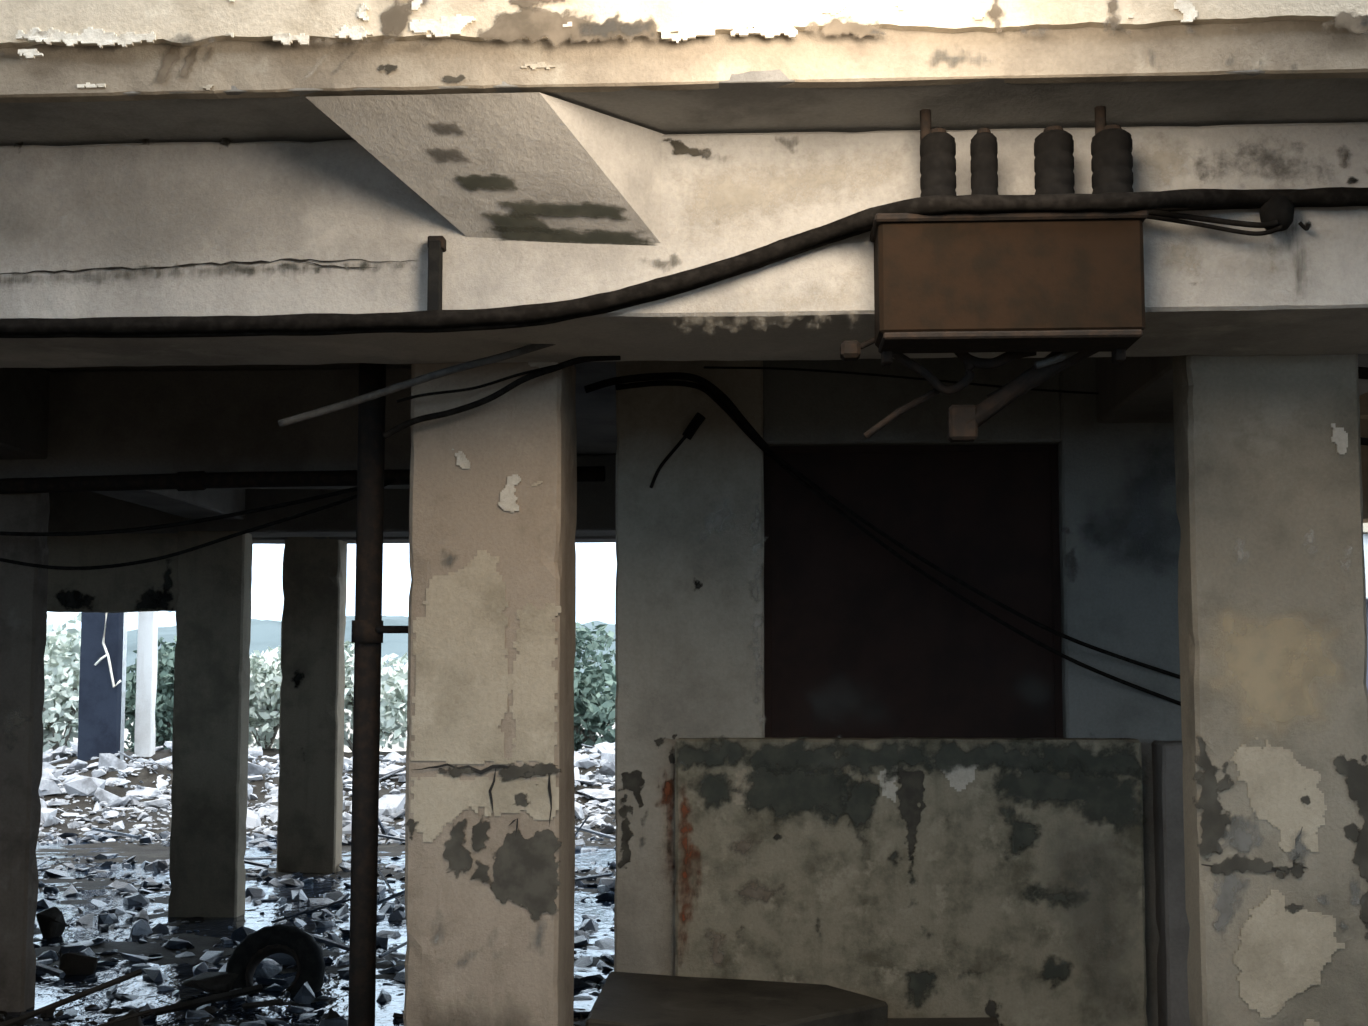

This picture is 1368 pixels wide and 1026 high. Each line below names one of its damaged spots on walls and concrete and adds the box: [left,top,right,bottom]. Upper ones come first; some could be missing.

peeling [16,27,156,59]
peeling [410,0,476,38]
spalling [427,123,653,246]
peeling [406,550,562,920]
crack [414,763,561,836]
damp [617,770,645,868]
corrosion [661,780,700,941]
damp [654,734,1144,883]
damp [1025,884,1085,907]
peeling [1193,736,1368,1018]
damp [906,971,937,1008]
damp [1040,956,1071,987]